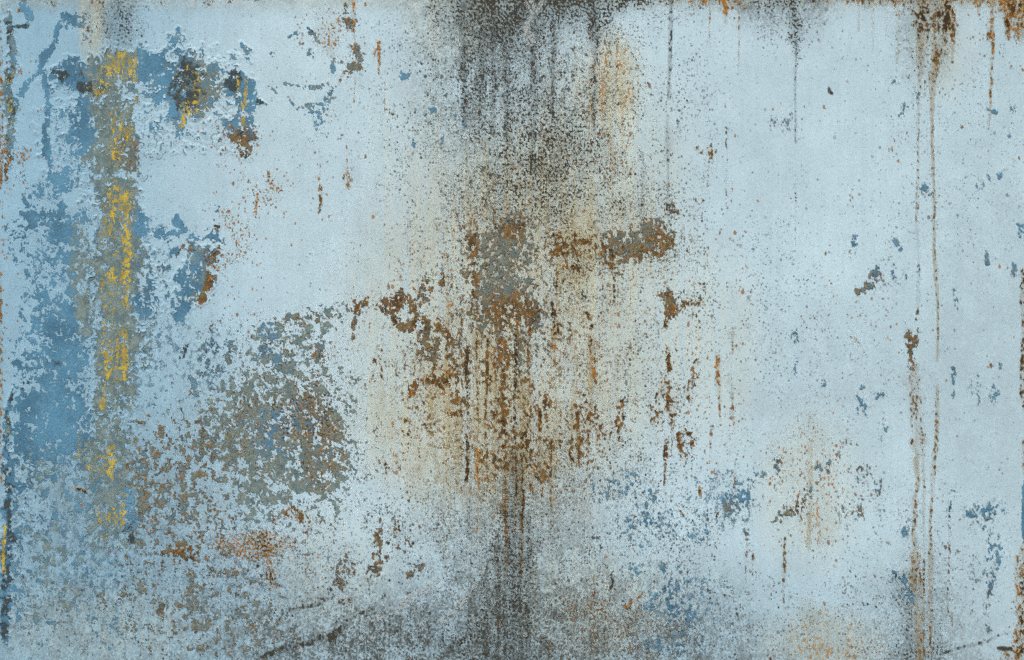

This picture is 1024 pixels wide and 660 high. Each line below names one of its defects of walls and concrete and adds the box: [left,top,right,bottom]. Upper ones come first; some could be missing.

peeling [0,0,683,660]
corrosion [176,199,701,591]
leakage [362,454,706,660]
leakage [427,0,824,317]
corrosion [903,364,939,660]
corrosion [915,125,939,339]
corrosion [846,0,1024,125]